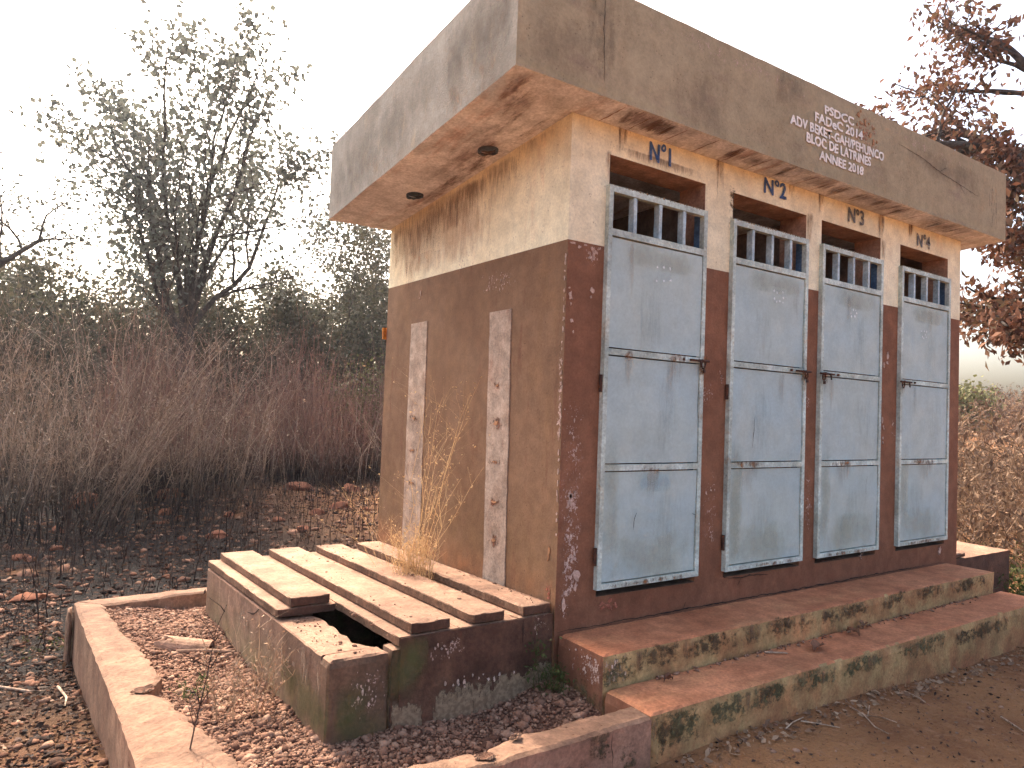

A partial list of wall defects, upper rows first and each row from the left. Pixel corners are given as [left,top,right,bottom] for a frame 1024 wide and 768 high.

peeling [556,242,601,617]
leakage [747,602,868,643]
leakage [957,619,1007,644]
peeling [351,670,385,719]
leakage [574,632,729,706]
leakage [711,654,882,724]
leakage [654,708,700,755]